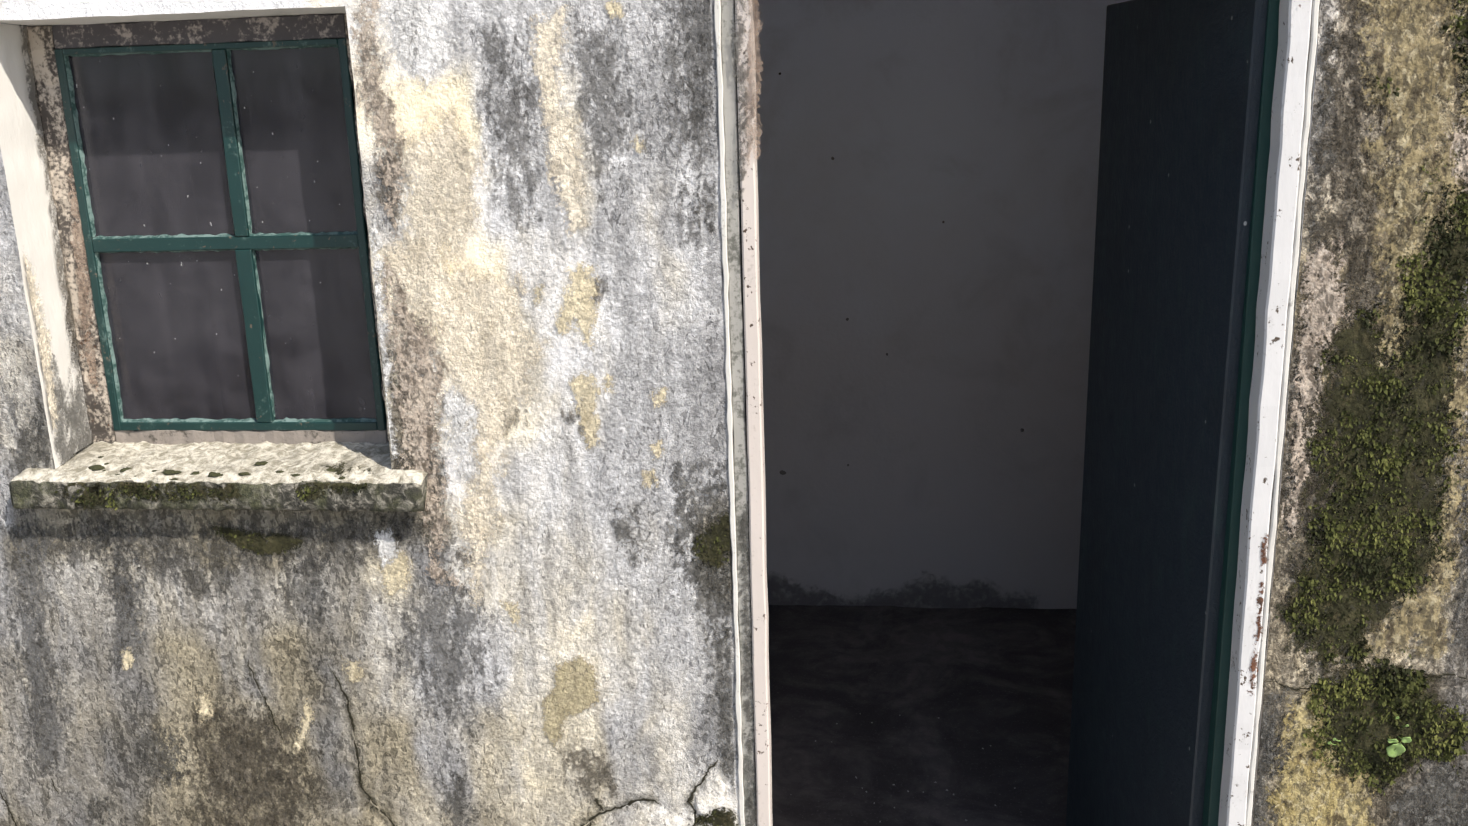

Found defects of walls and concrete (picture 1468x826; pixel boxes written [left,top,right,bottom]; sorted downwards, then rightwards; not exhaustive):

leakage [568,13,642,179]
leakage [655,0,717,249]
leakage [731,0,749,200]
leakage [0,25,94,476]
leakage [0,138,482,776]
leakage [1254,0,1468,826]
leakage [135,682,332,826]
crack [246,660,282,739]
crack [328,665,395,826]
leakage [384,546,500,738]
crack [581,756,726,826]
corrosion [1247,533,1269,696]